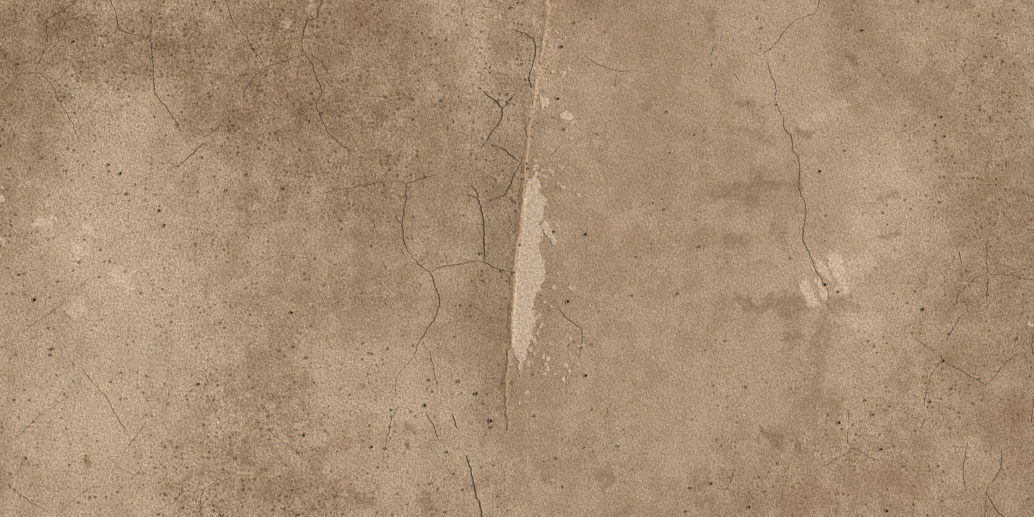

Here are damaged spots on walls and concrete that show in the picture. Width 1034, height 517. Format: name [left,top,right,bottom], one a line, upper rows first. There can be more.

crack [325,29,593,444]
flaking render [512,153,581,392]
crack [752,0,831,308]